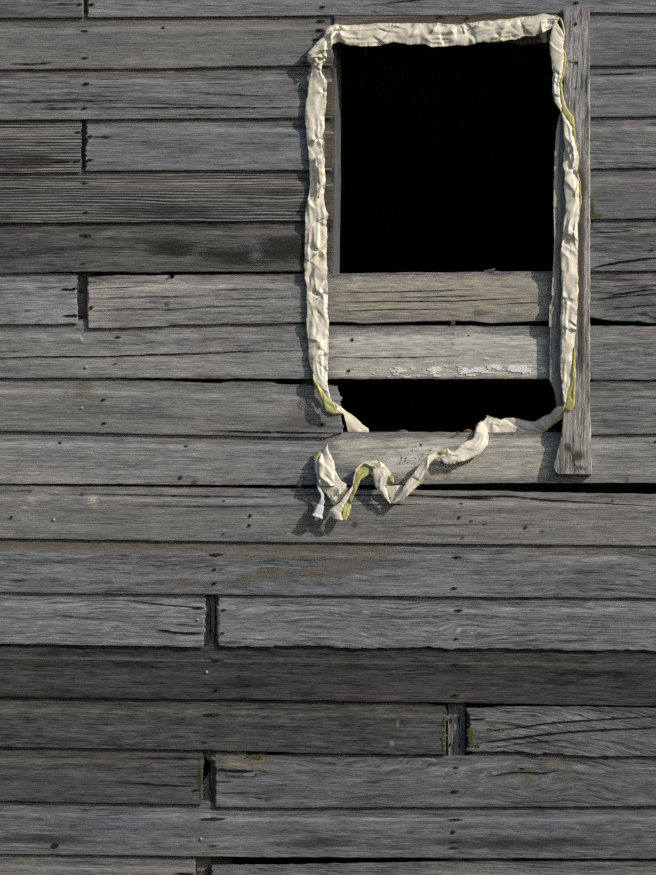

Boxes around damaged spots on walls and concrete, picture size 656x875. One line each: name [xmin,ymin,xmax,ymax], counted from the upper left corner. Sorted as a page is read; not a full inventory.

peeling [387,358,547,378]
crack [469,716,656,748]
crack [488,768,559,777]